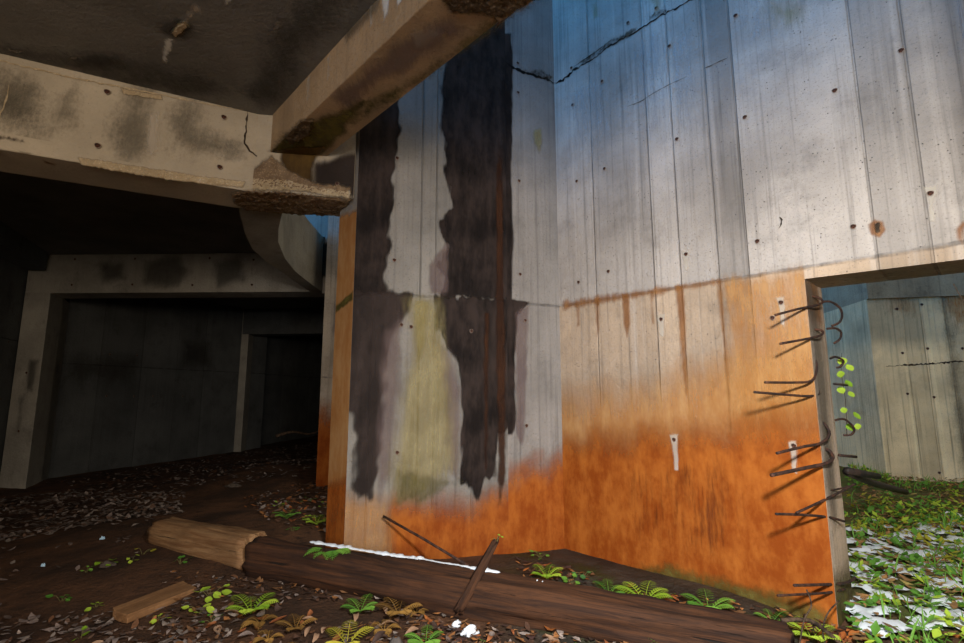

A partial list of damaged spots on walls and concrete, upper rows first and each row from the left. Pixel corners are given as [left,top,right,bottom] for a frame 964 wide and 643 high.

spalling [442,0,533,27]
leakage [163,21,188,61]
crack [506,0,690,83]
crack [244,111,257,157]
spalling [78,156,351,217]
leakage [281,20,528,500]
spalling [774,295,843,345]
rust [316,162,853,629]
spalling [753,360,820,397]
spalling [770,418,857,477]
spalling [775,483,856,523]
spalling [777,576,856,597]